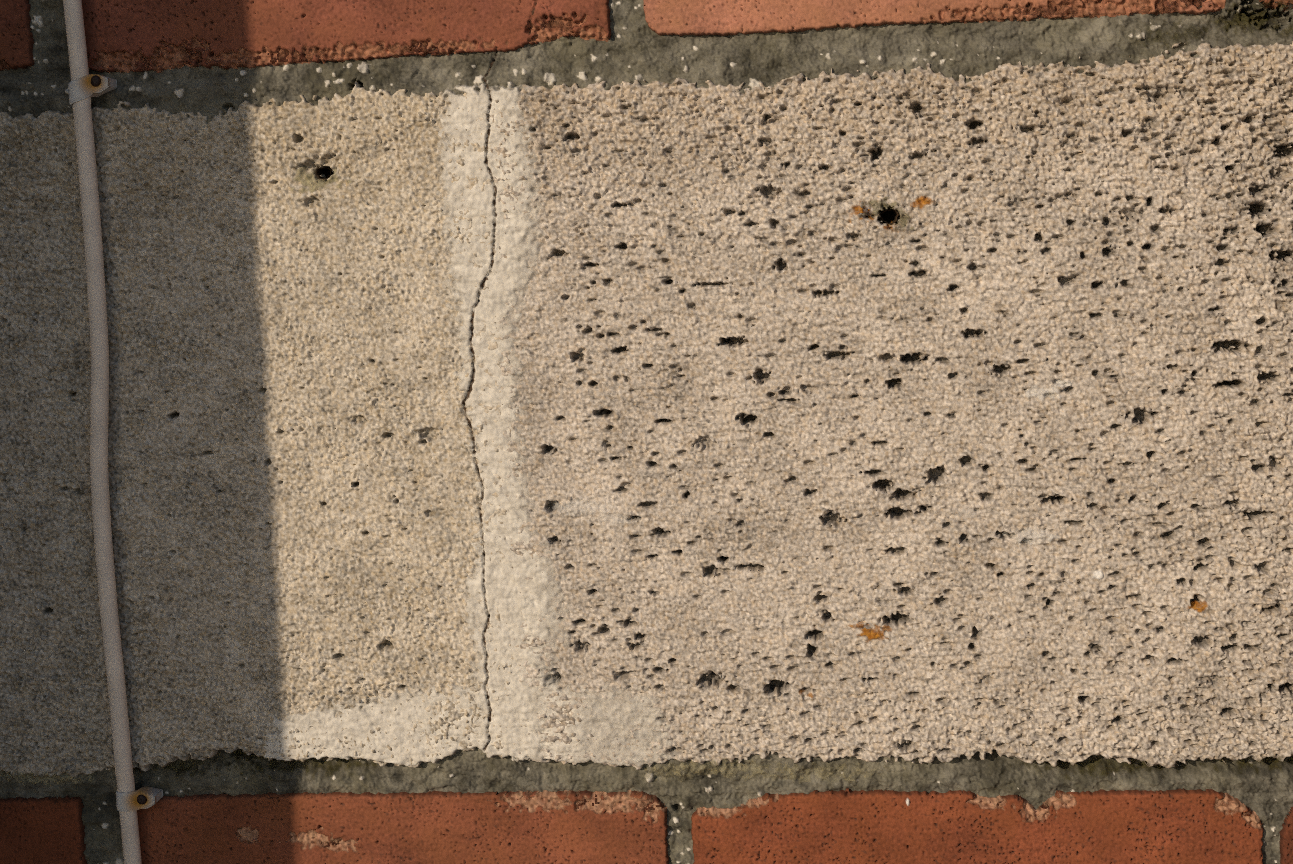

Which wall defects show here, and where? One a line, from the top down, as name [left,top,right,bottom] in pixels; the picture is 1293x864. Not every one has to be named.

crack [462,47,497,750]
rust [912,196,931,208]